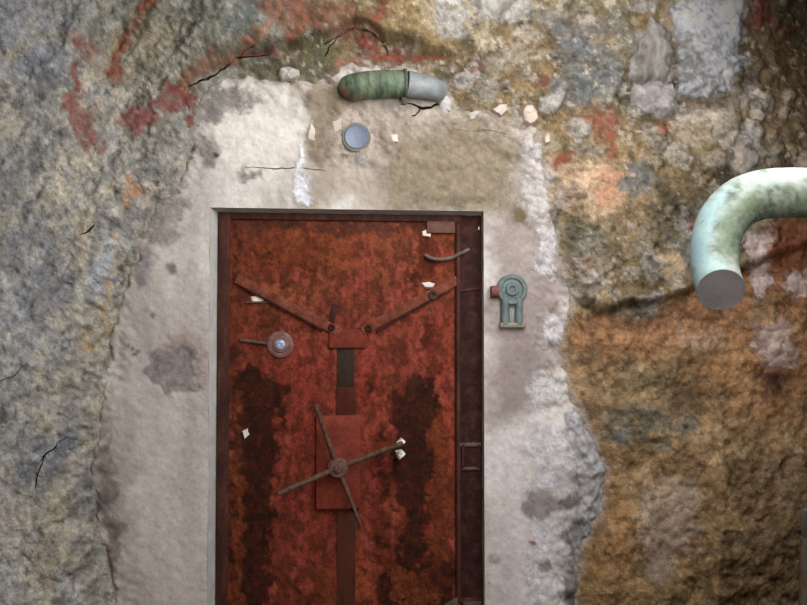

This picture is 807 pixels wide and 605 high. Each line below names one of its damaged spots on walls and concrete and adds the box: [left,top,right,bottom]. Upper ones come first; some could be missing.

corrosion [63,67,105,150]
corrosion [104,22,144,83]
corrosion [121,47,236,136]
crack [183,43,272,110]
damp [294,82,341,206]
corrosion [242,0,445,68]
crack [325,27,388,57]
crack [408,102,506,134]
corrosion [228,229,291,605]
crack [36,436,67,485]
corrosion [368,325,443,605]
damp [521,426,591,605]